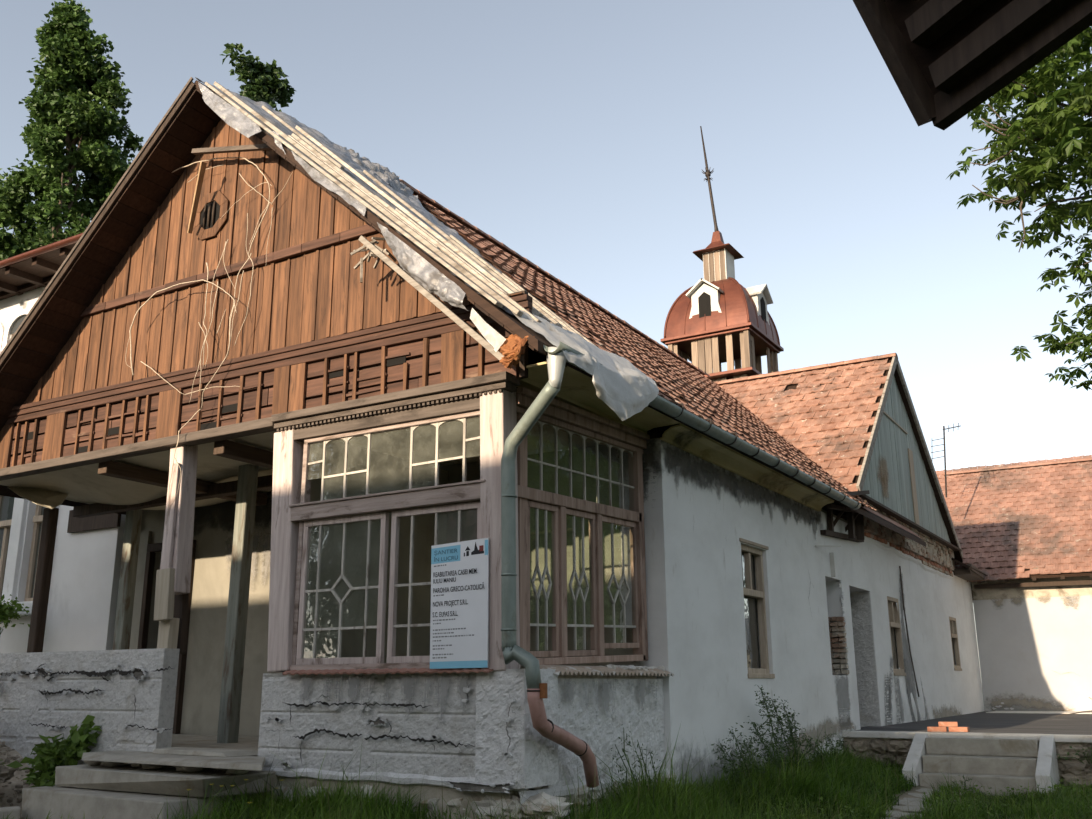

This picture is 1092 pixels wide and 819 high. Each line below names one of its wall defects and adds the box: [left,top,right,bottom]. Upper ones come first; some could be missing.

damp [642,433,821,535]
crack [0,664,173,734]
crack [266,694,475,762]
flaking render [443,780,514,794]